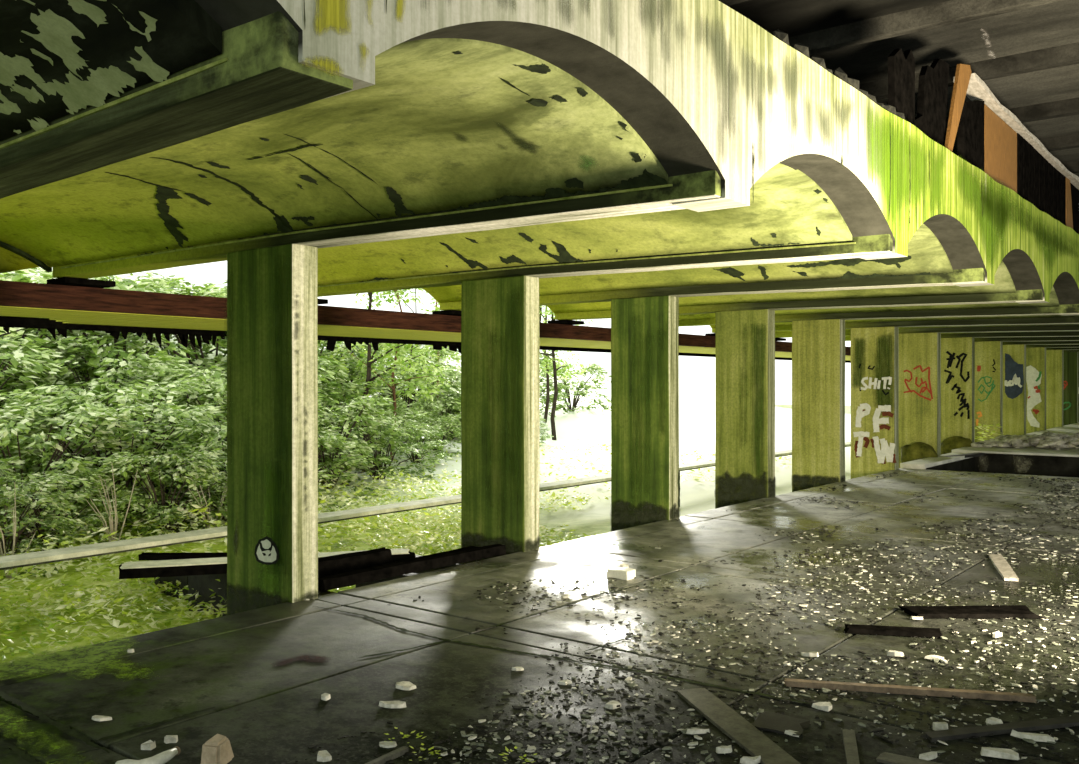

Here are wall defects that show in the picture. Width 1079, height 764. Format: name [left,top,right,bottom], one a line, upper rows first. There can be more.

peeling [0,0,170,134]
crack [500,78,530,96]
leakage [707,23,798,159]
crack [105,134,378,231]
leakage [870,110,944,223]
peeling [519,233,591,263]
peeling [714,267,745,281]
peeling [787,256,931,280]
leakage [611,333,680,532]
leakage [715,325,776,508]
leakage [792,475,846,492]
spalling [926,453,1079,478]